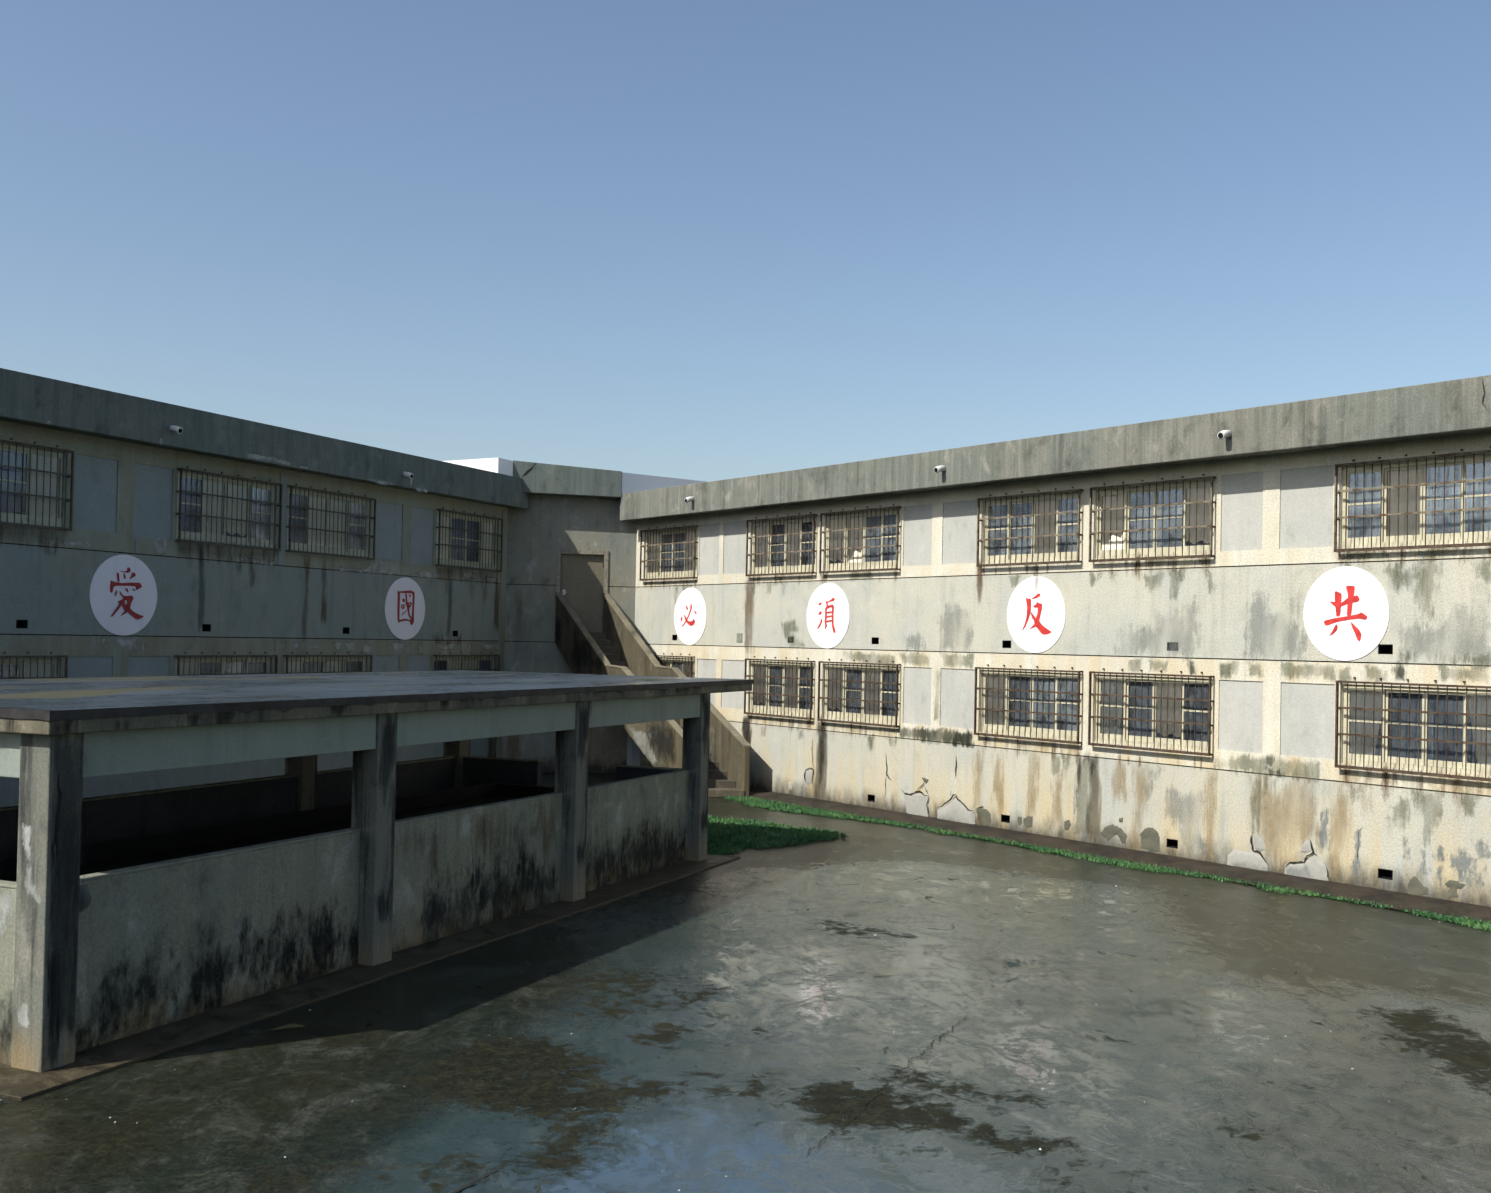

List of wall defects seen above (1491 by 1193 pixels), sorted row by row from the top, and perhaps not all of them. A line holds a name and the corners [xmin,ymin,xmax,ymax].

peeling [902,778,929,817]
water stain [1077,760,1099,833]
peeling [1227,809,1330,881]
water stain [48,906,358,1065]
water stain [0,1011,12,1044]